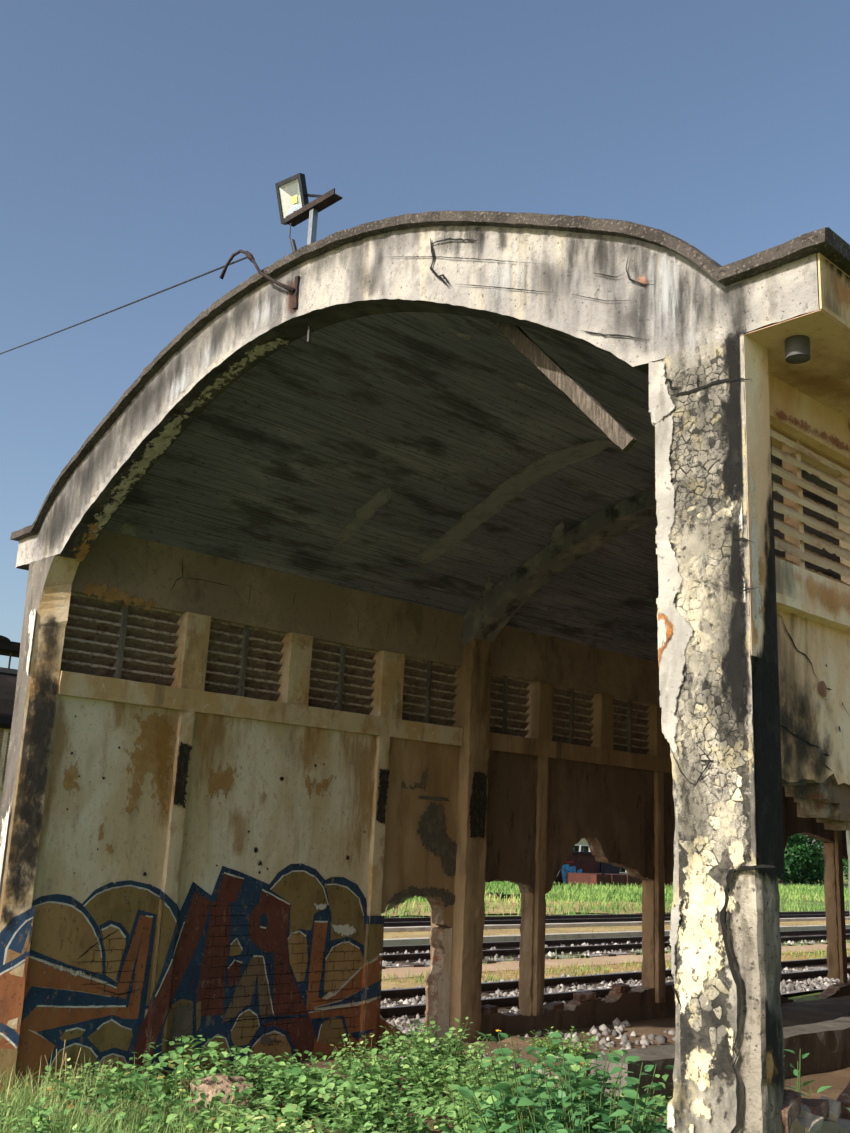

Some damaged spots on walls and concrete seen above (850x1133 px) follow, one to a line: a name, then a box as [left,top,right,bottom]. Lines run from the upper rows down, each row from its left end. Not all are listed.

peeling [82,338,289,541]
crack [399,238,654,301]
crack [580,330,650,341]
damp [716,329,746,501]
damp [1,616,58,924]
peeling [118,712,192,817]
spalling [658,613,673,667]
peeling [675,832,736,1014]
crack [661,353,775,1133]
peeling [728,840,744,869]
damp [720,439,829,883]
crack [777,614,849,715]